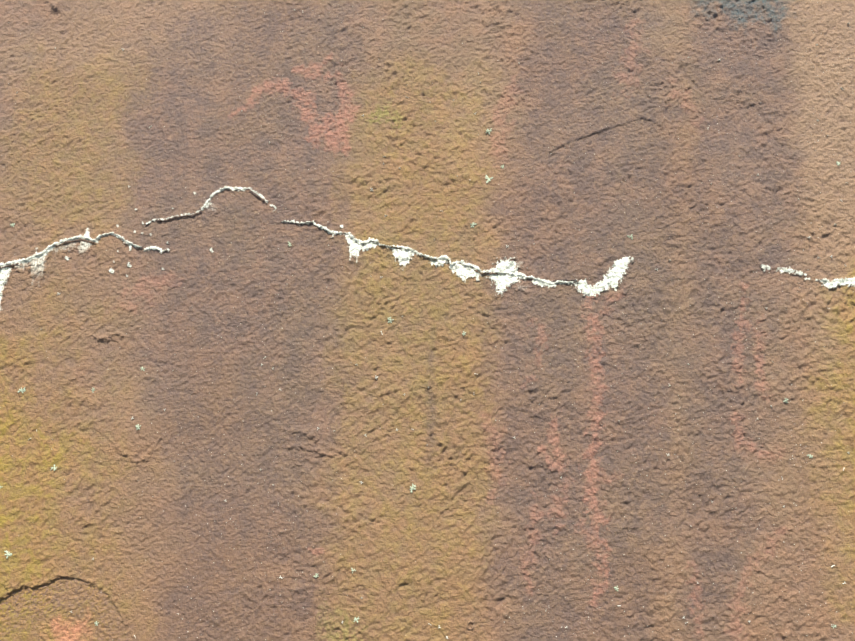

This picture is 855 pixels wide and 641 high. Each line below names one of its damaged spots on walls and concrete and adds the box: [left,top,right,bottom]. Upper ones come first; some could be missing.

crack [0,185,635,319]
rust [514,282,631,613]
leakage [485,0,822,641]
crack [759,264,855,291]